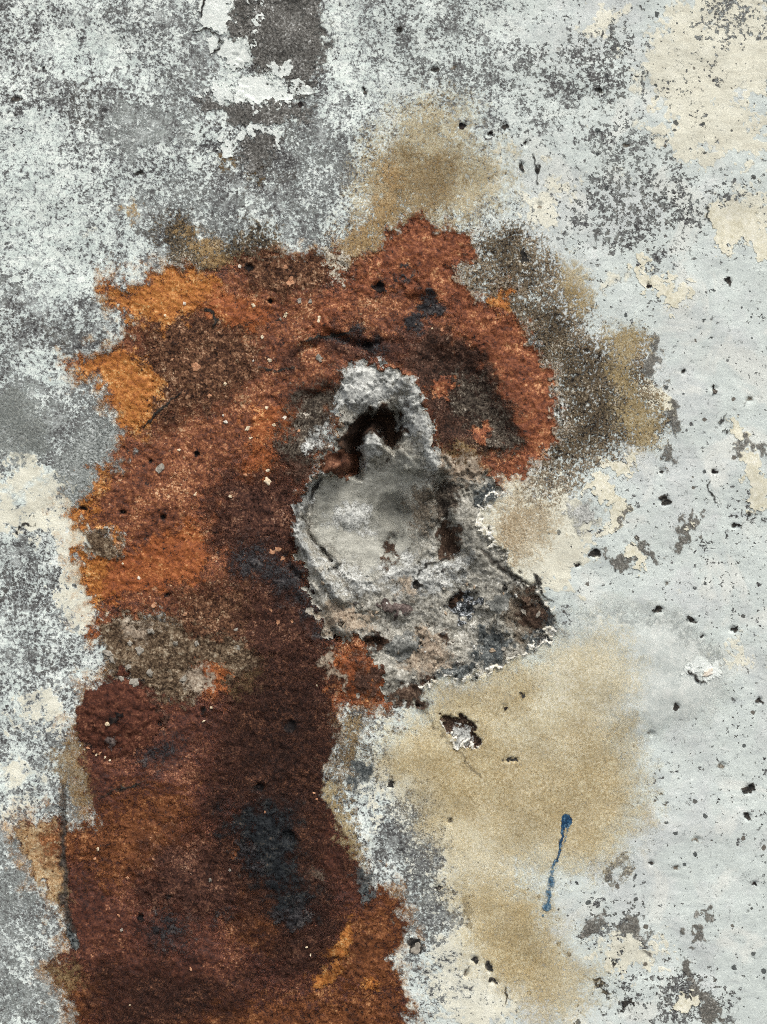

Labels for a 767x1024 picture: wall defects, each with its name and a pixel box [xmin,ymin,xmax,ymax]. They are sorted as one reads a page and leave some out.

peeling [190,0,338,178]
rust [5,209,560,1024]
spalling [290,356,564,710]
spalling [439,706,482,750]
leakage [314,629,648,1023]
leakage [329,101,670,568]
peeling [524,328,560,459]